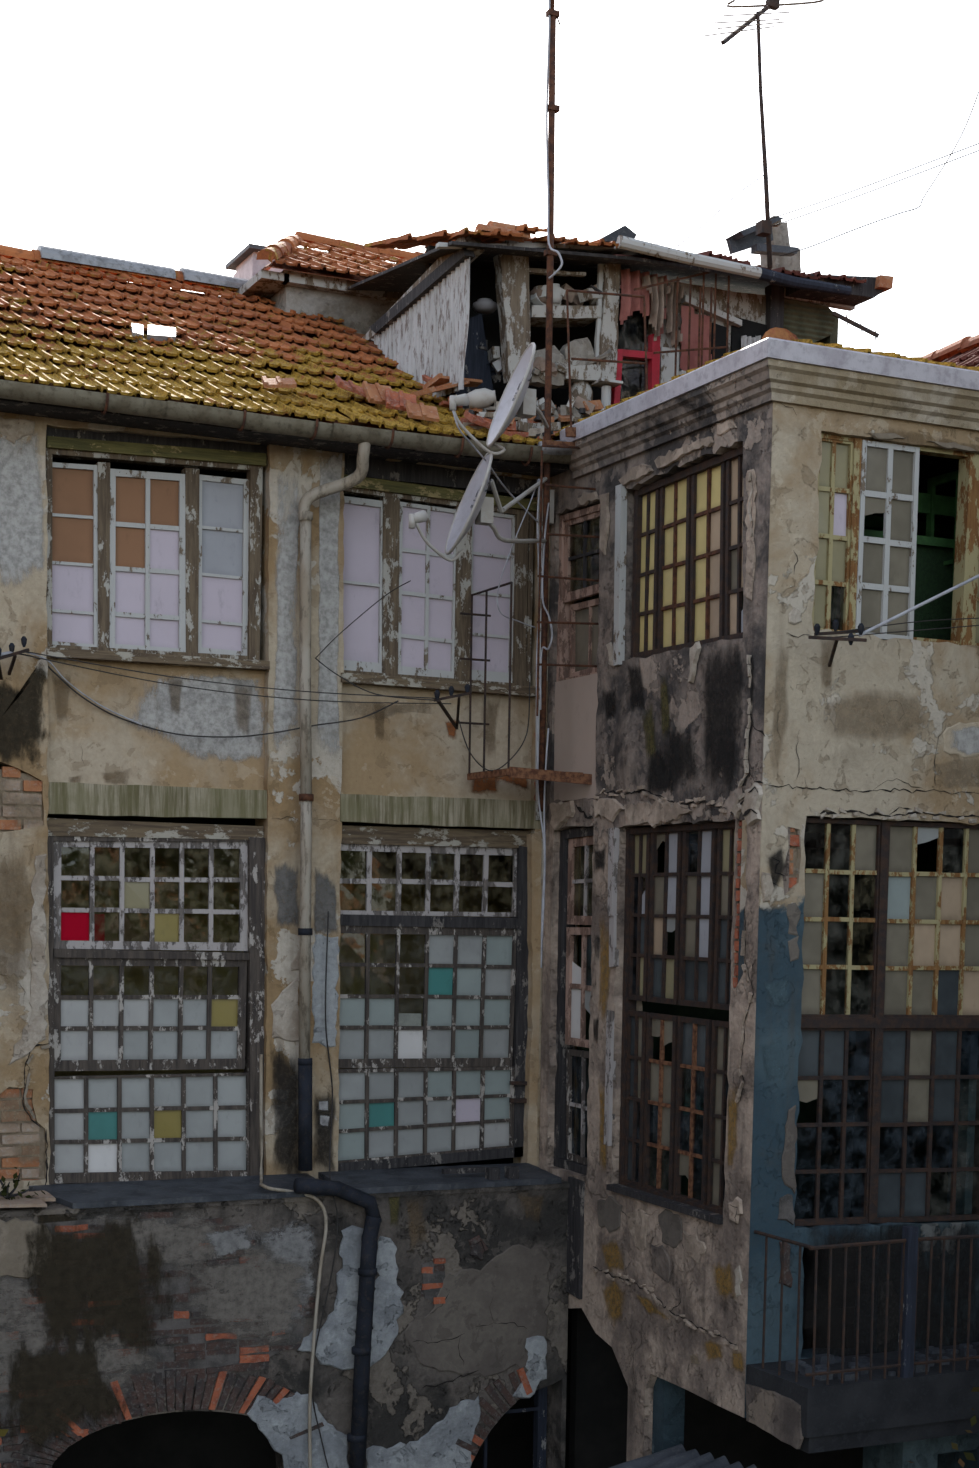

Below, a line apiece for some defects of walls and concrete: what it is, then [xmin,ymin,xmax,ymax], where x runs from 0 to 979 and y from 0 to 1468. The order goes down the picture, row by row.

peeling [0,416,35,444]
water stain [603,646,742,791]
flaking render [0,766,43,832]
peeling [9,854,49,1065]
peeling [271,935,340,1048]
crack [735,908,755,1103]
water stain [38,1207,77,1223]
water stain [98,1213,315,1351]
flaking render [0,1087,551,1468]
water stain [0,1275,157,1450]